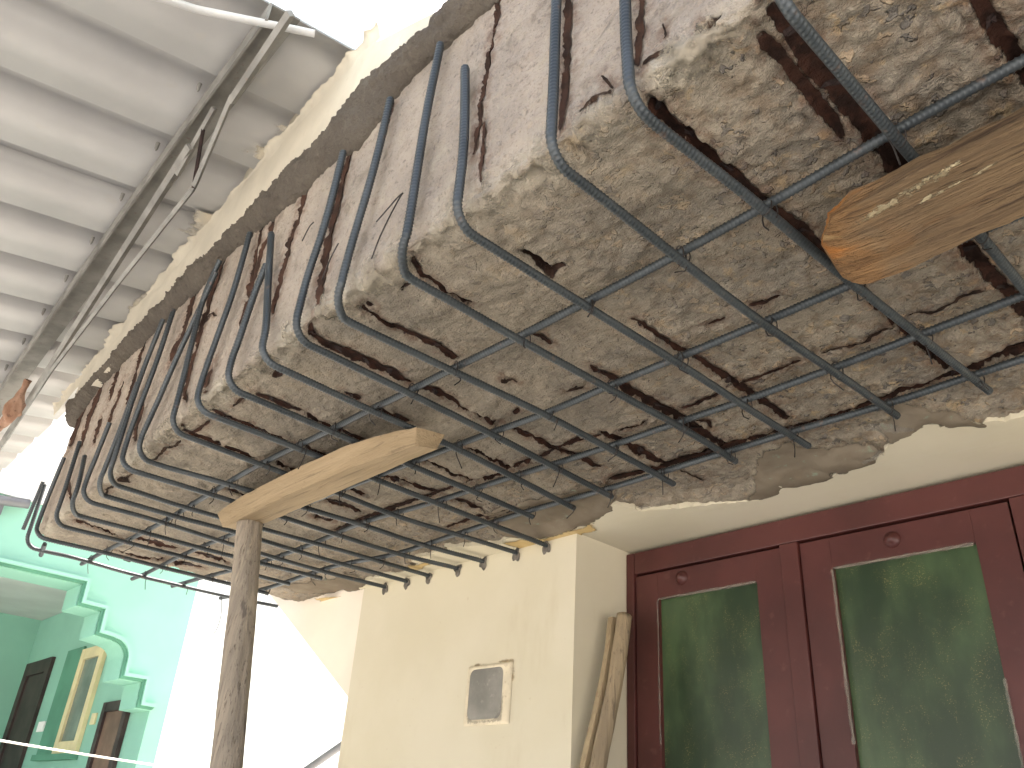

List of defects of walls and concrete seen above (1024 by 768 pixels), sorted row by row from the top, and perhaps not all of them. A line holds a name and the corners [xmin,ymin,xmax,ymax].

corrosion [472,0,501,182]
corrosion [558,0,572,130]
corrosion [756,2,908,173]
corrosion [271,194,307,314]
corrosion [315,154,352,308]
spalling [39,0,1024,602]
corrosion [648,97,828,256]
corrosion [749,295,783,306]
corrosion [308,301,1024,530]